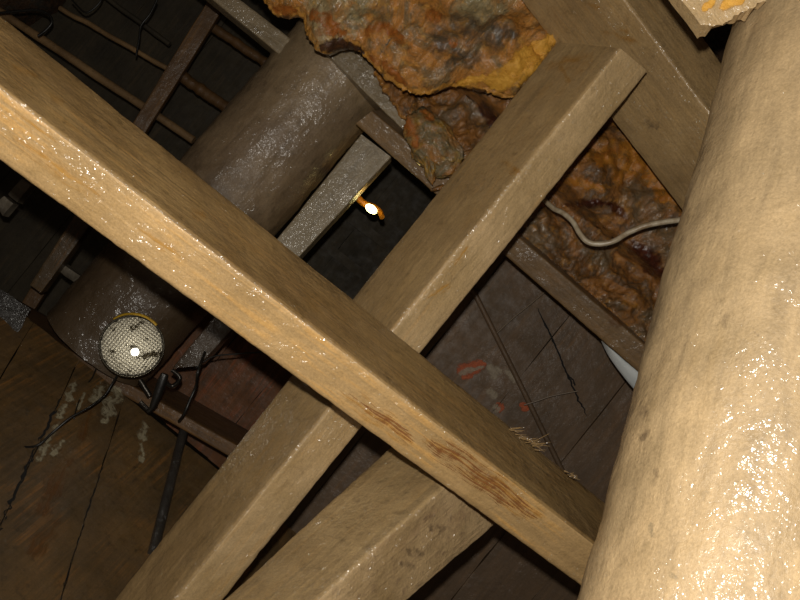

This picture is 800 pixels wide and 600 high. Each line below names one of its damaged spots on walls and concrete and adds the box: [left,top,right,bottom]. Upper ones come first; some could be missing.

crack [538,309,587,416]
crack [0,397,62,531]
efflorescence [36,382,123,461]